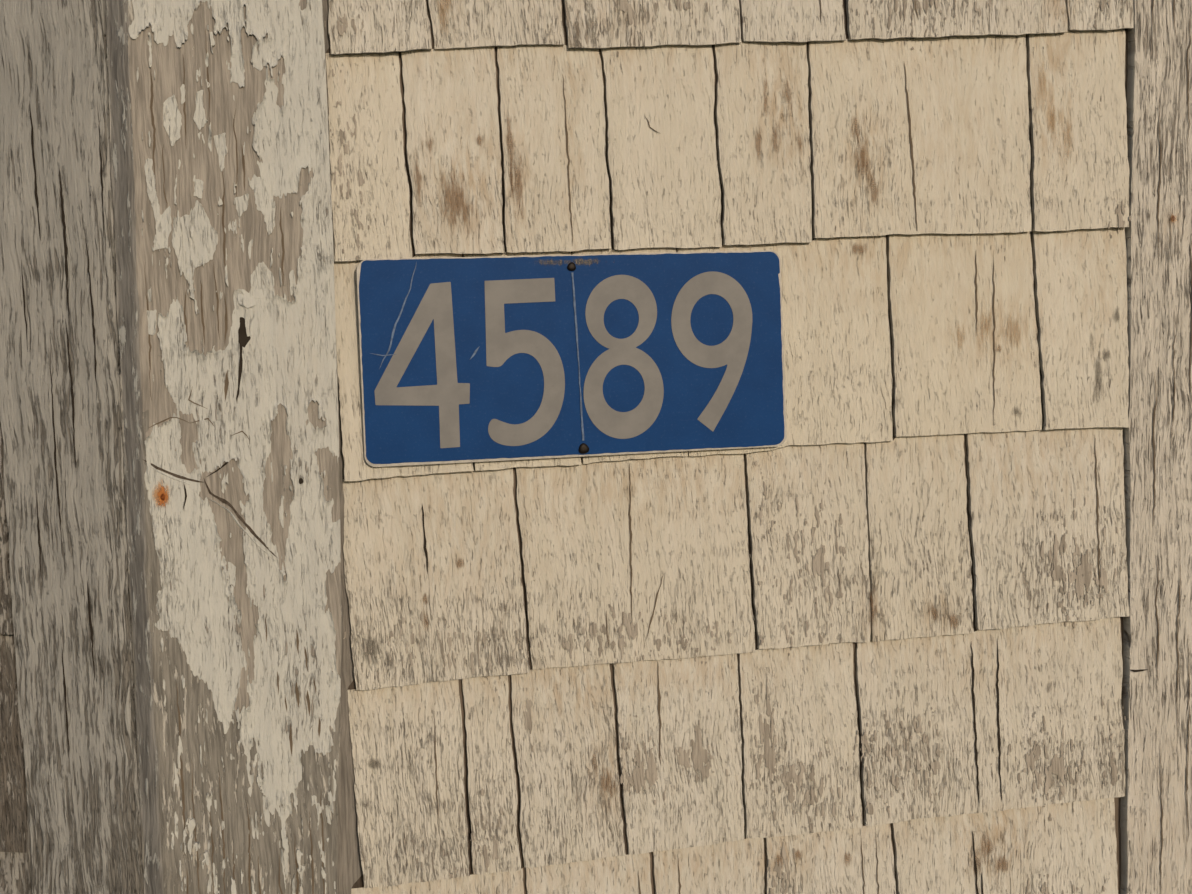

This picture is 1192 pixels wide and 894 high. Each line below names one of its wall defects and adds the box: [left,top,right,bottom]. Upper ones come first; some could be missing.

corrosion [154,485,168,506]
crack [144,30,276,561]
peeling [128,1,340,894]
crack [278,210,286,285]